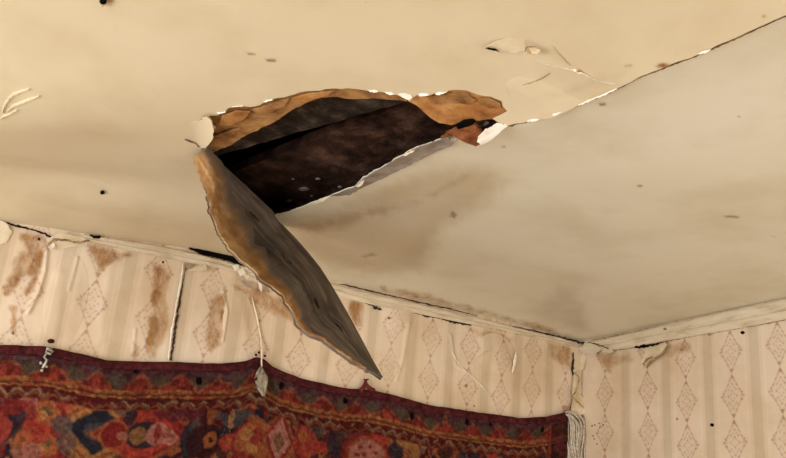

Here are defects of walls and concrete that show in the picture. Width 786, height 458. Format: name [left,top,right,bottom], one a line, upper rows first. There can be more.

peeling [485,38,540,54]
crack [509,15,786,127]
spalling [207,88,507,205]
water stain [3,235,42,295]
water stain [92,247,115,268]
water stain [147,318,166,345]
crack [168,248,245,361]